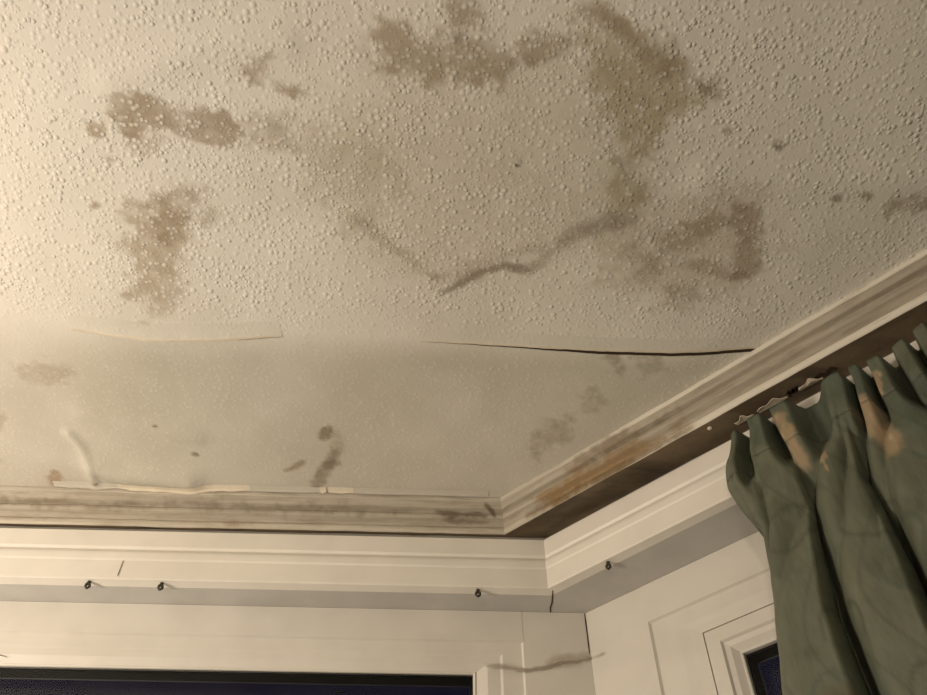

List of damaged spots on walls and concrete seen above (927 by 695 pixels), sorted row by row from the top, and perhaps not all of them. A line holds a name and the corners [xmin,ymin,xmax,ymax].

damp [111,96,171,130]
crack [487,614,590,672]